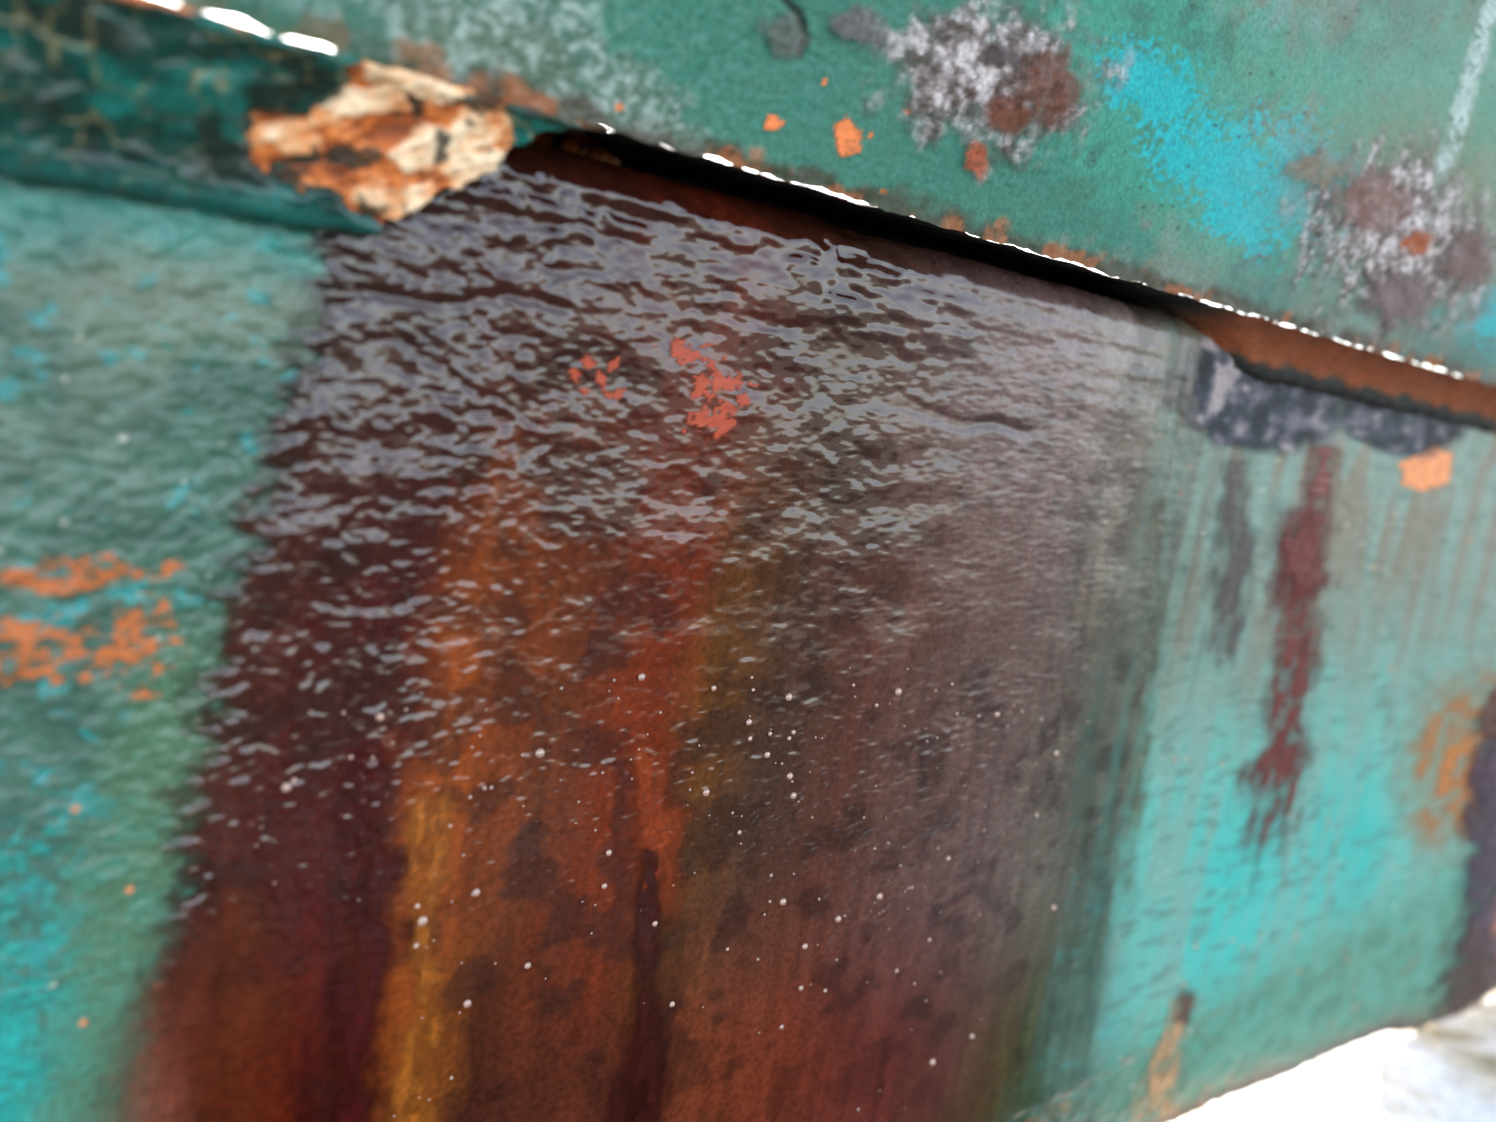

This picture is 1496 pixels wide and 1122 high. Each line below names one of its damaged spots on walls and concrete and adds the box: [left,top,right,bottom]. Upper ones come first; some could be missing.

rust [124,143,1194,1122]
rust [1214,459,1256,655]
rust [1239,445,1338,847]
rust [1415,691,1496,1018]